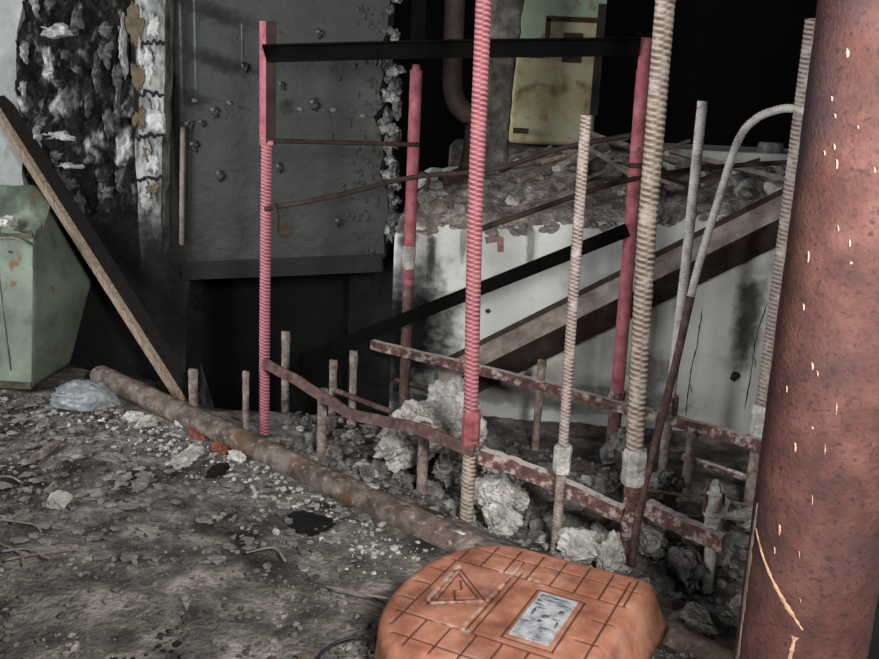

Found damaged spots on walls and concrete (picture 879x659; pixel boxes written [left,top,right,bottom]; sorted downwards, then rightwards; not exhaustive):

spalling [356,0,403,41]
spalling [15,0,166,267]
spalling [340,59,407,244]
spalling [416,218,467,236]
spalling [484,216,573,236]
spalling [583,219,617,232]
spalling [657,210,734,227]
damp [734,281,762,361]